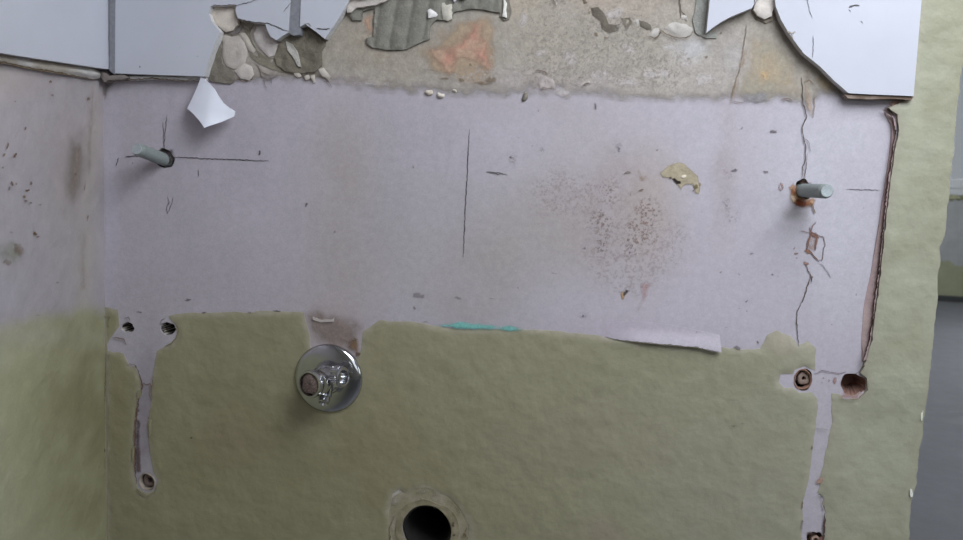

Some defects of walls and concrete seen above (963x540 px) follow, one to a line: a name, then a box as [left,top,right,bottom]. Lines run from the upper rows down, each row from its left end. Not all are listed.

flaking render [212,7,296,79]
flaking render [314,0,842,103]
crack [786,1,815,181]
corrosion [779,180,816,213]
peeling [103,68,903,540]
crack [794,222,831,345]